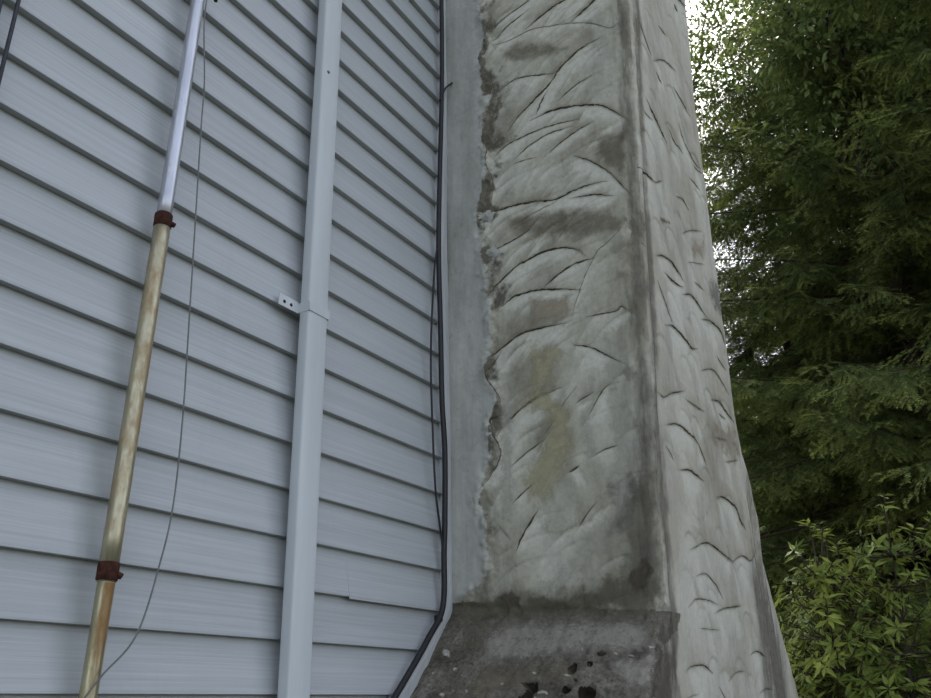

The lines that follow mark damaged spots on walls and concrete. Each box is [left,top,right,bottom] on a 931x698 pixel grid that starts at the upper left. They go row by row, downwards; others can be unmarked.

crack [477,0,700,485]
crack [658,255,732,480]
crack [498,510,538,553]
crack [692,542,755,561]
crack [692,573,738,630]
spalling [485,620,658,698]
crack [691,651,764,698]